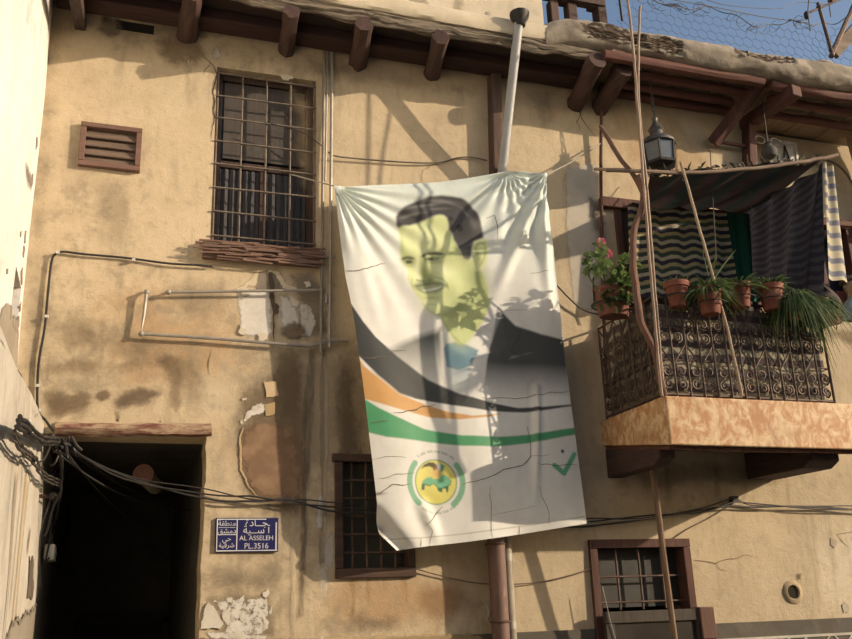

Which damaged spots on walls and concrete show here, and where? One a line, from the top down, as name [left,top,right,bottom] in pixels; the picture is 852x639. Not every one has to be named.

spalling [580,22,684,54]
flaking render [236,269,325,342]
leakage [48,388,156,420]
flaking render [26,532,34,600]
peeling [200,589,272,639]